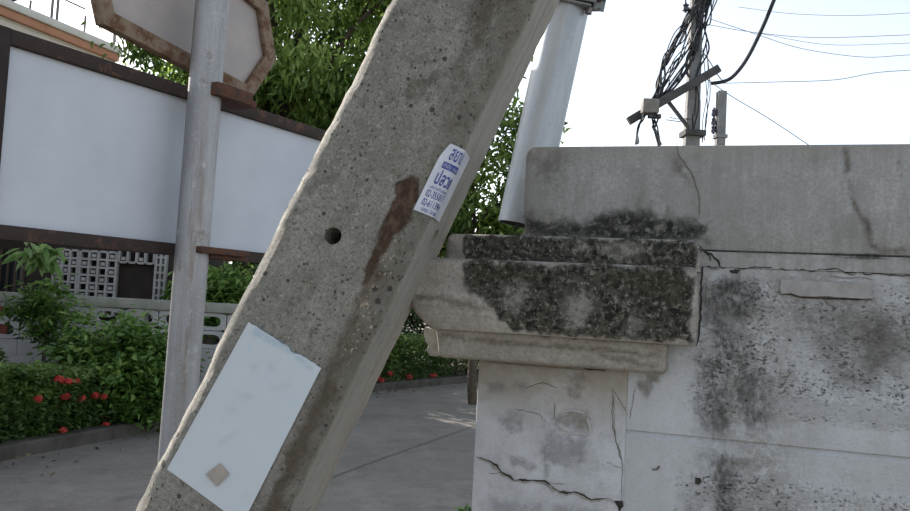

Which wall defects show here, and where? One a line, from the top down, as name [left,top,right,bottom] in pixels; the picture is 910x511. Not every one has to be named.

corrosion [363,176,419,285]
damp [524,210,707,240]
crack [676,143,700,217]
crack [477,362,635,511]